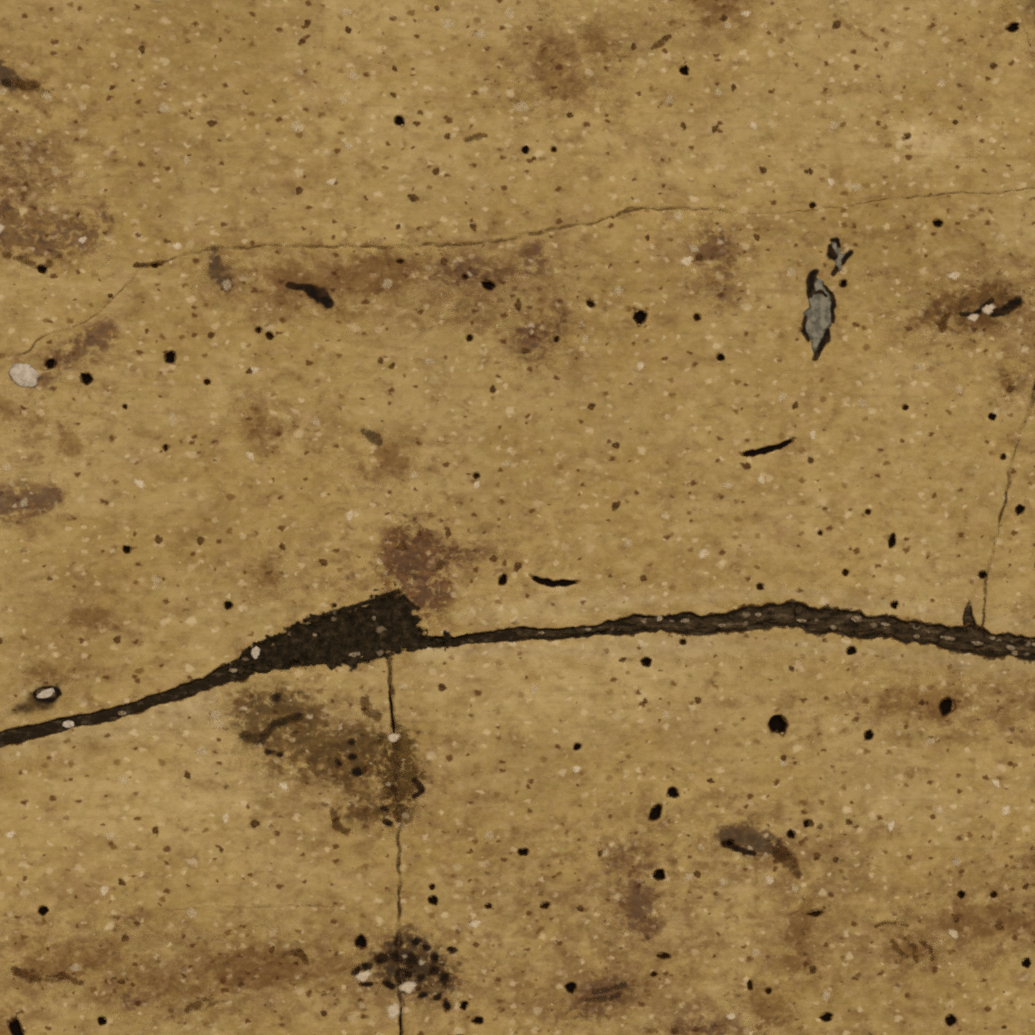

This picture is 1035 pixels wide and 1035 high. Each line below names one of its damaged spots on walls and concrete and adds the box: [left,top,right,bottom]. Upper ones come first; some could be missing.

damp [999,0,1035,61]
crack [140,257,175,267]
crack [238,242,265,250]
crack [305,243,387,251]
crack [422,207,707,247]
crack [999,473,1010,522]
crack [0,645,309,768]
crack [386,573,1035,946]
crack [397,973,405,1035]